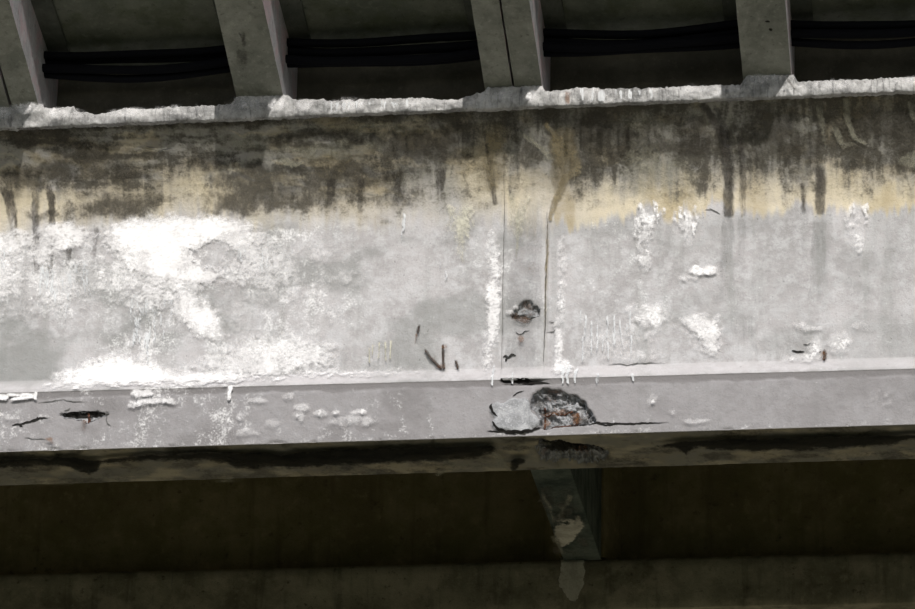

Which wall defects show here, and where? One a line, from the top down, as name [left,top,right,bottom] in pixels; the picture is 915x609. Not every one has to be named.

leakage [184,100,915,216]
leakage [0,127,163,236]
leakage [549,190,561,221]
peeling [483,232,540,385]
spalling [531,303,666,465]
crack [14,399,83,439]
crack [571,419,665,427]
leakage [0,445,531,475]
leakage [655,435,915,455]